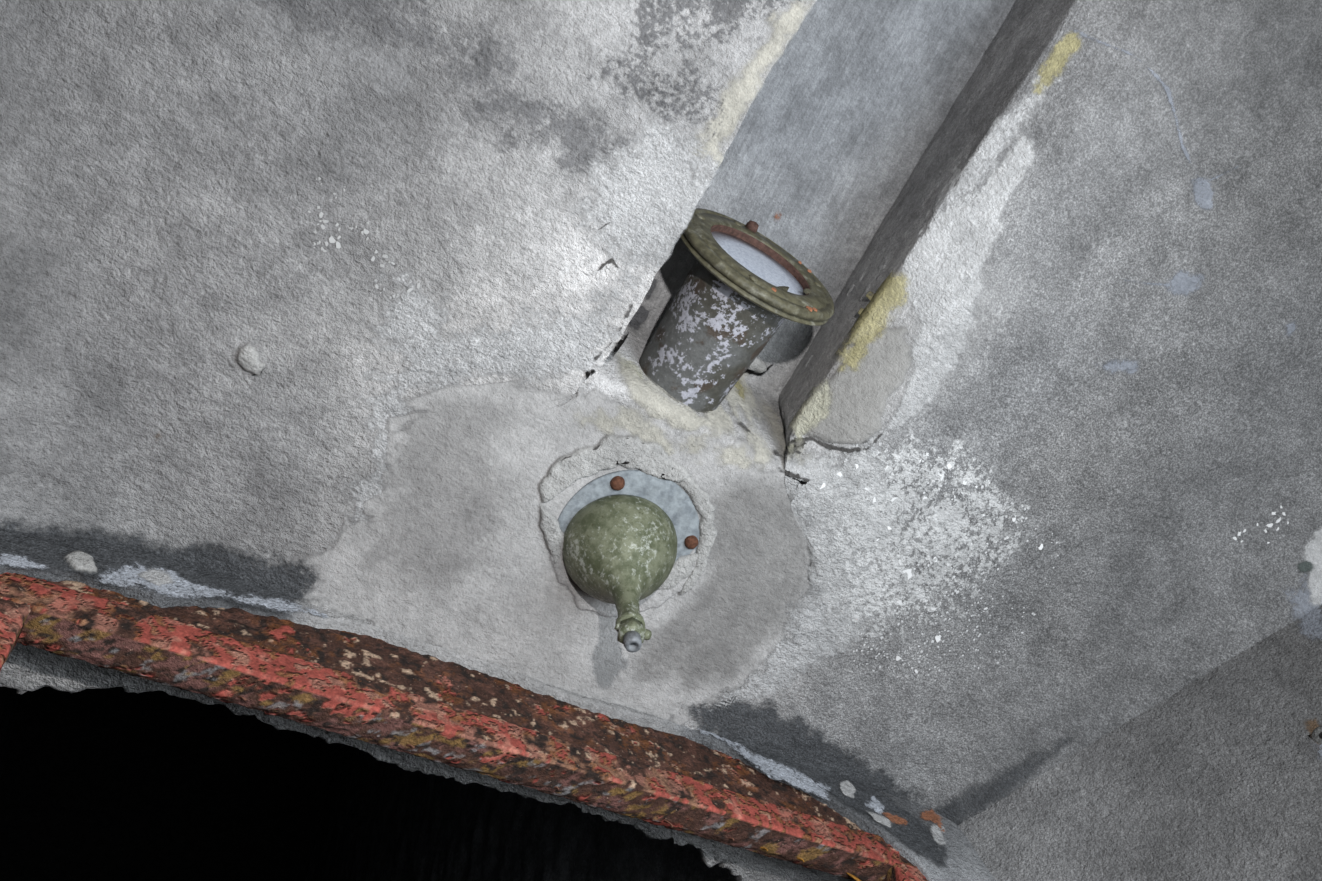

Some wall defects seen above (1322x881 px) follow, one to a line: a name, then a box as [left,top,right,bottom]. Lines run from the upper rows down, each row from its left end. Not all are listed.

crack [598,259,618,271]
crack [585,304,633,380]
leakage [582,33,1080,866]
leakage [0,520,328,618]
peeling [1286,527,1322,640]
corrosion [884,809,946,845]